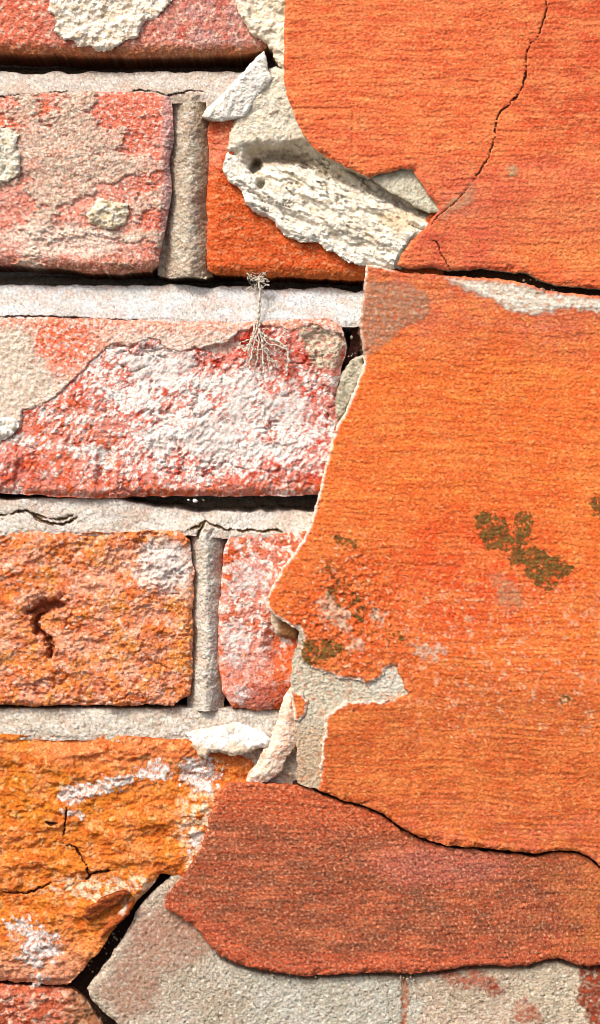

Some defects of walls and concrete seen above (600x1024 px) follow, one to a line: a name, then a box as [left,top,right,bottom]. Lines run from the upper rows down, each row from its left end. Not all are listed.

spalling [202,0,439,270]
crack [431,1,600,296]
spalling [0,325,347,499]
spalling [20,594,69,659]
peeling [318,592,364,651]
peeling [412,642,447,661]
flaking render [246,613,408,790]
crack [292,780,391,820]
crack [45,808,111,880]
crack [455,845,595,861]
crack [2,882,52,894]
peeling [82,890,134,938]